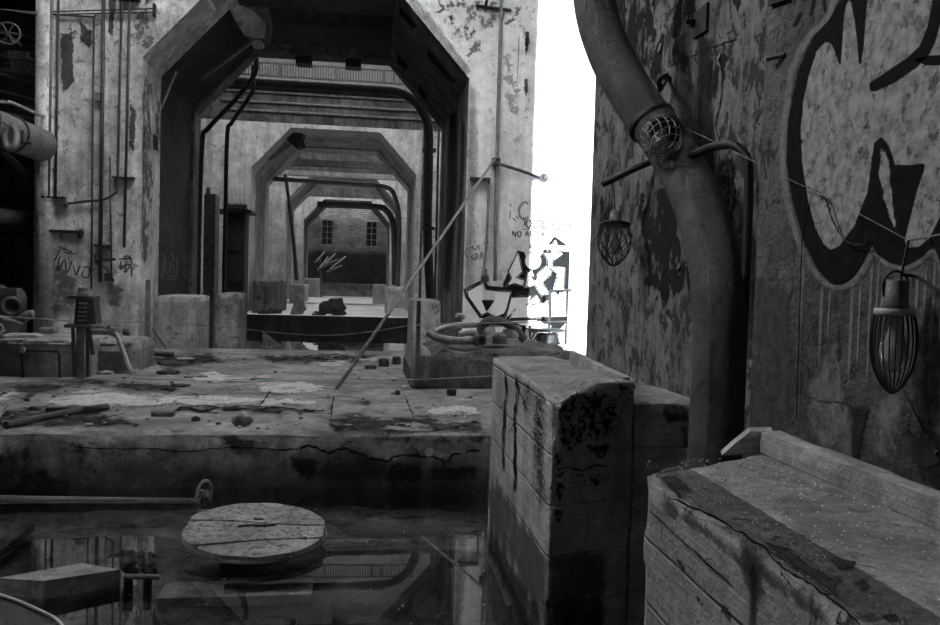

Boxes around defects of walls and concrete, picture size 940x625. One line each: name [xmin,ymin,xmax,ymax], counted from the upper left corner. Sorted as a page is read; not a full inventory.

peeling [435,0,528,61]
peeling [492,54,530,118]
water stain [0,353,326,427]
water stain [248,353,376,369]
water stain [0,440,97,493]
water stain [221,435,265,449]
crack [80,371,525,491]
water stain [291,456,478,482]
crack [649,497,860,625]